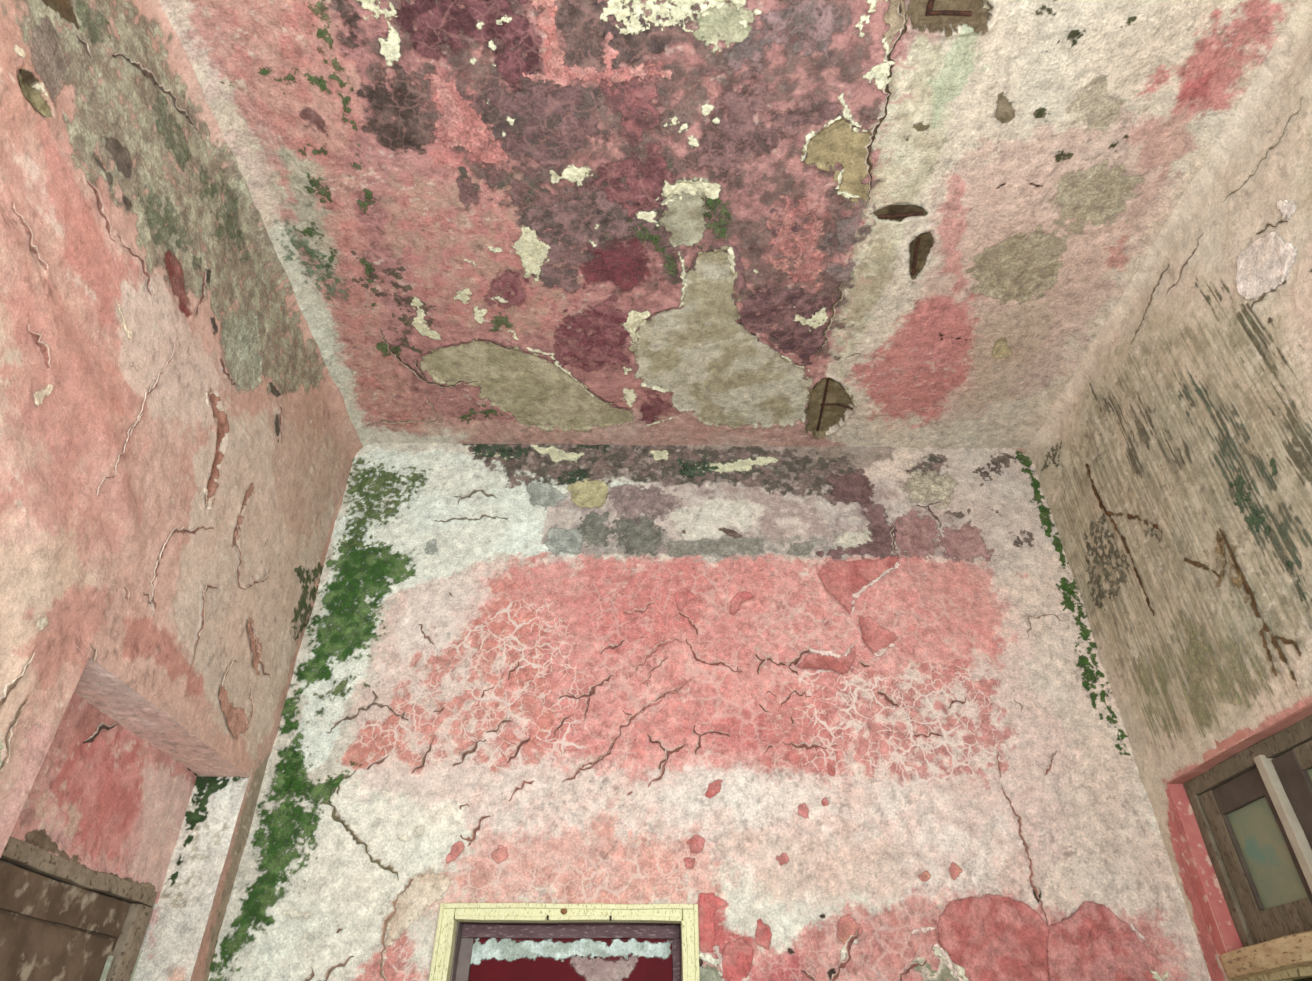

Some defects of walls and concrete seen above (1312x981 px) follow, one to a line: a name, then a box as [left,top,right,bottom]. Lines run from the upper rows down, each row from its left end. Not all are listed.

spalling [15,45,52,117]
crack [77,34,201,134]
crack [86,180,152,295]
spalling [411,176,857,439]
spalling [567,478,609,508]
leakage [1090,383,1192,478]
leakage [1174,303,1312,607]
leakage [1084,513,1130,611]
leakage [1134,611,1292,752]
crack [304,602,827,981]
crack [995,750,1048,924]
peeling [698,892,772,981]